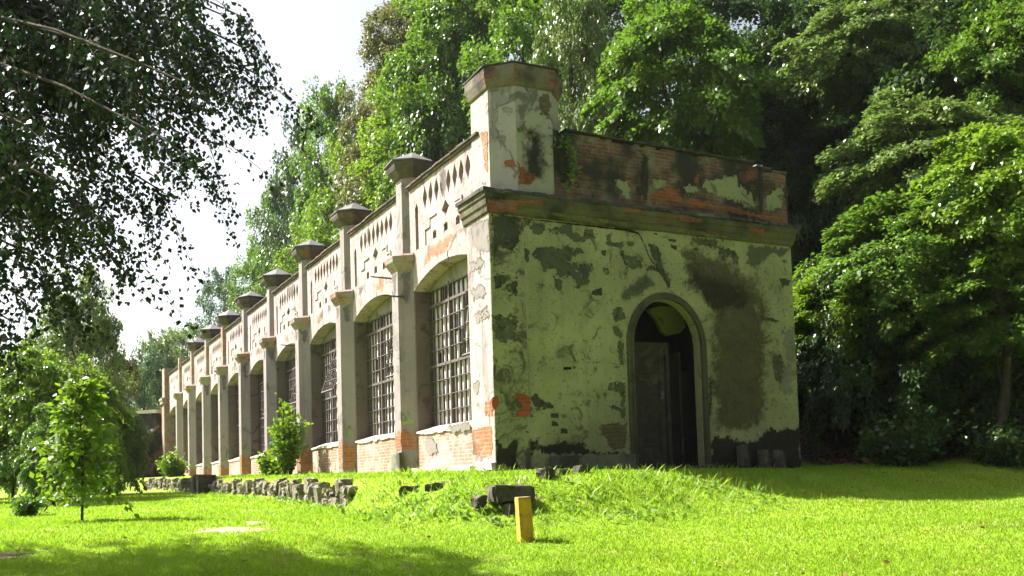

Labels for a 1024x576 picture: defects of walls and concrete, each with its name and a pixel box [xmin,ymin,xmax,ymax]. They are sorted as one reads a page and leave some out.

flaking render [504,159,535,186]
water stain [523,130,590,189]
peeling [615,179,641,214]
flaking render [648,169,787,234]
water stain [671,229,802,469]
flaking render [338,425,356,470]
flaking render [395,408,437,456]
flaking render [447,380,499,459]
flaking render [516,393,568,434]
water stain [495,435,626,469]
flaking render [599,381,628,450]